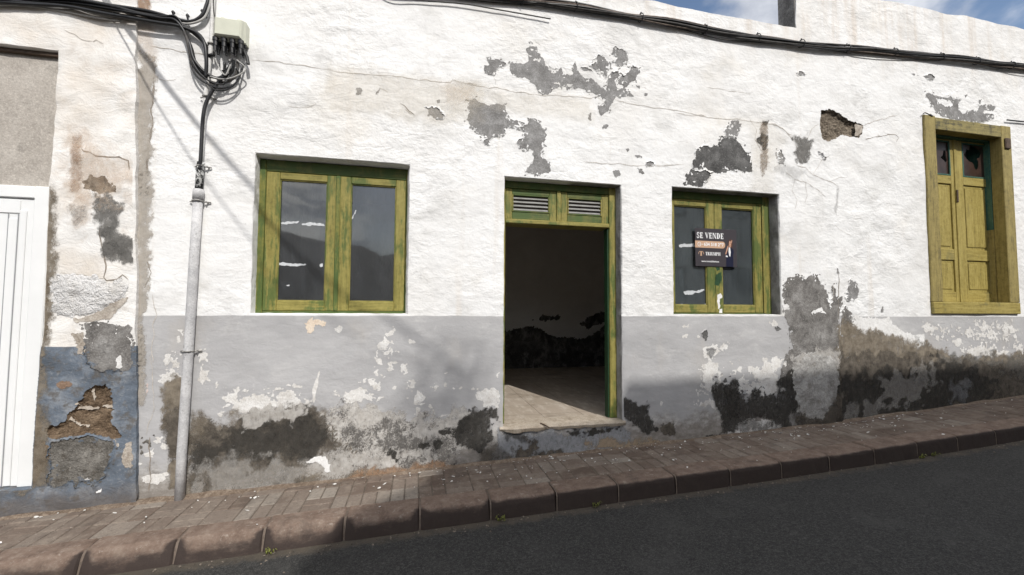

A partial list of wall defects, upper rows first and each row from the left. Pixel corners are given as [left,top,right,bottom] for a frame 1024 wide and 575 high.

flaking render [82,174,116,194]
peeling [464,96,551,176]
peeling [484,42,648,129]
peeling [683,120,752,187]
flaking render [818,109,863,161]
peeling [911,72,995,123]
peeling [12,187,169,496]
peeling [197,348,312,417]
leakage [160,374,676,494]
leakage [706,369,800,437]
peeling [682,268,1024,450]
leakage [833,318,1024,422]